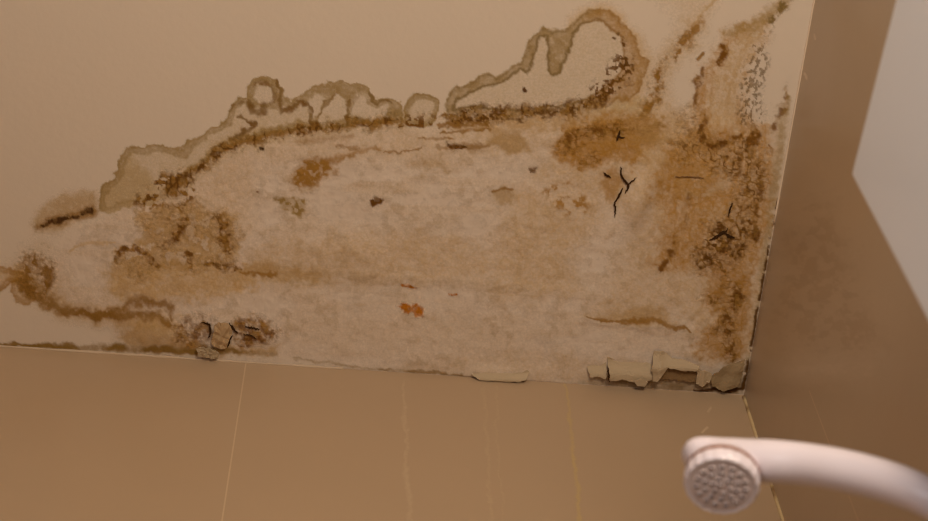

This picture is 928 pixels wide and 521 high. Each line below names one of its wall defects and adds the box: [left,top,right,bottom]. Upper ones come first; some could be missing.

damp [0,0,896,395]
crack [604,167,635,216]
crack [710,203,735,240]
peeling [587,357,653,387]
damp [292,355,466,521]